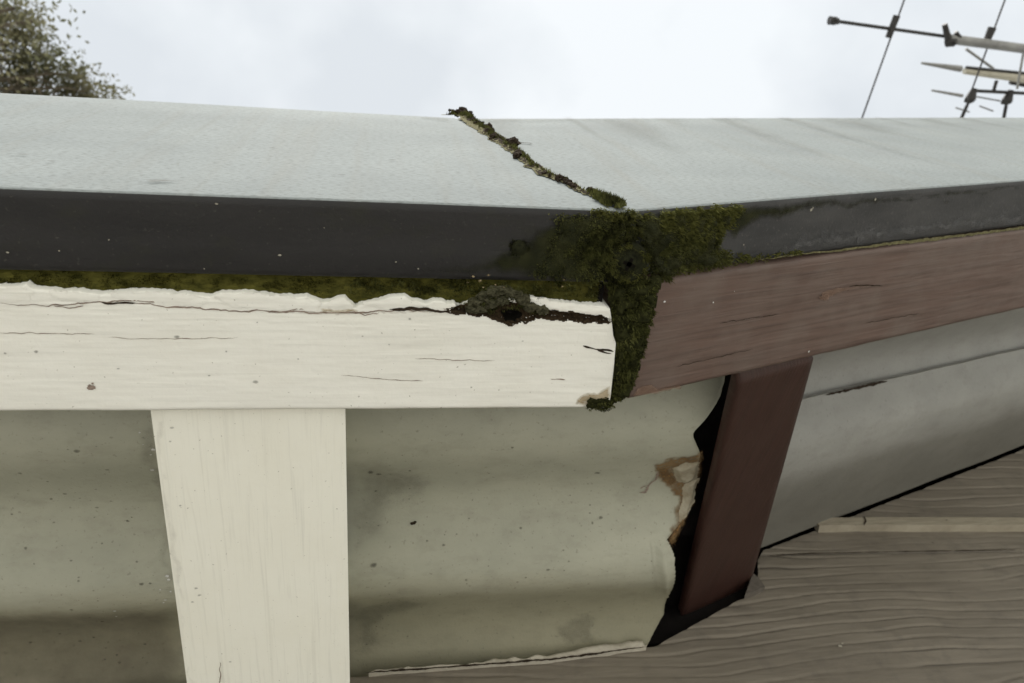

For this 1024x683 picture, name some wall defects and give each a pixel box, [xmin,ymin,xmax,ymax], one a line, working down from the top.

peeling [0,286,34,303]
peeling [49,289,464,314]
peeling [530,297,611,315]
leakage [578,389,615,412]